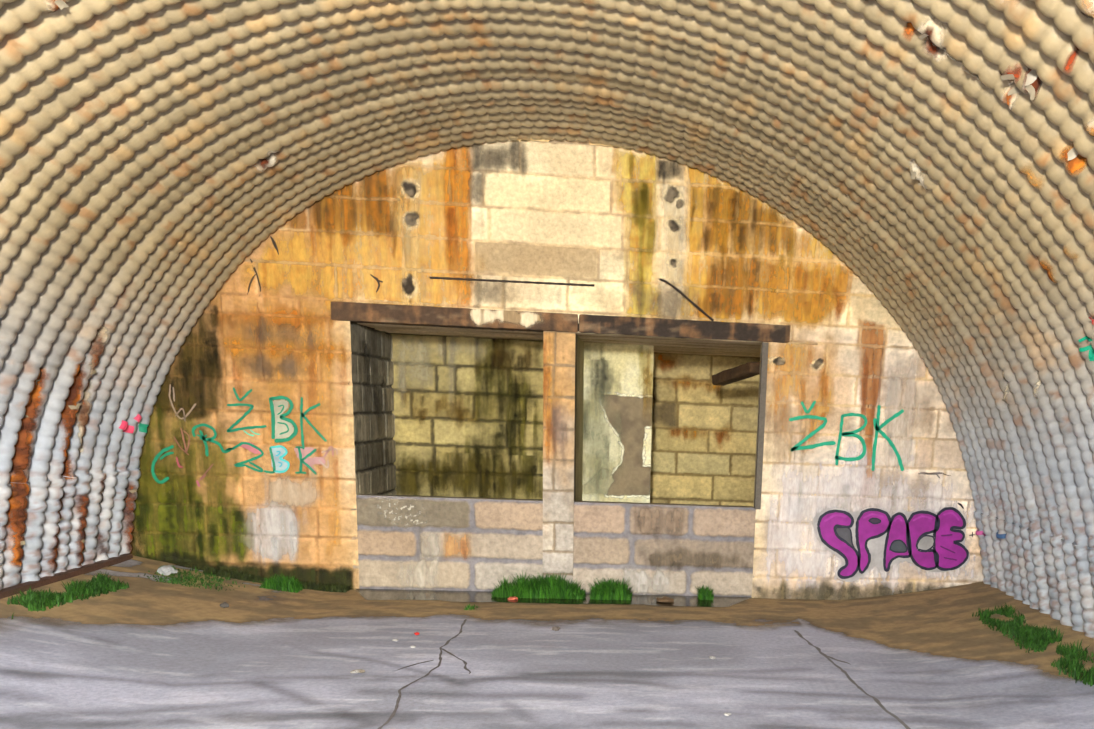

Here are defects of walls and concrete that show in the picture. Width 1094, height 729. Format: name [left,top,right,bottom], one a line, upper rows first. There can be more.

peeling [1083,0,1094,24]
rust [224,146,472,402]
rust [682,167,849,323]
rust [5,368,46,566]
rust [48,326,108,568]
water stain [358,337,457,483]
peeling [584,392,653,499]
rust [860,321,884,507]
crack [378,619,471,729]